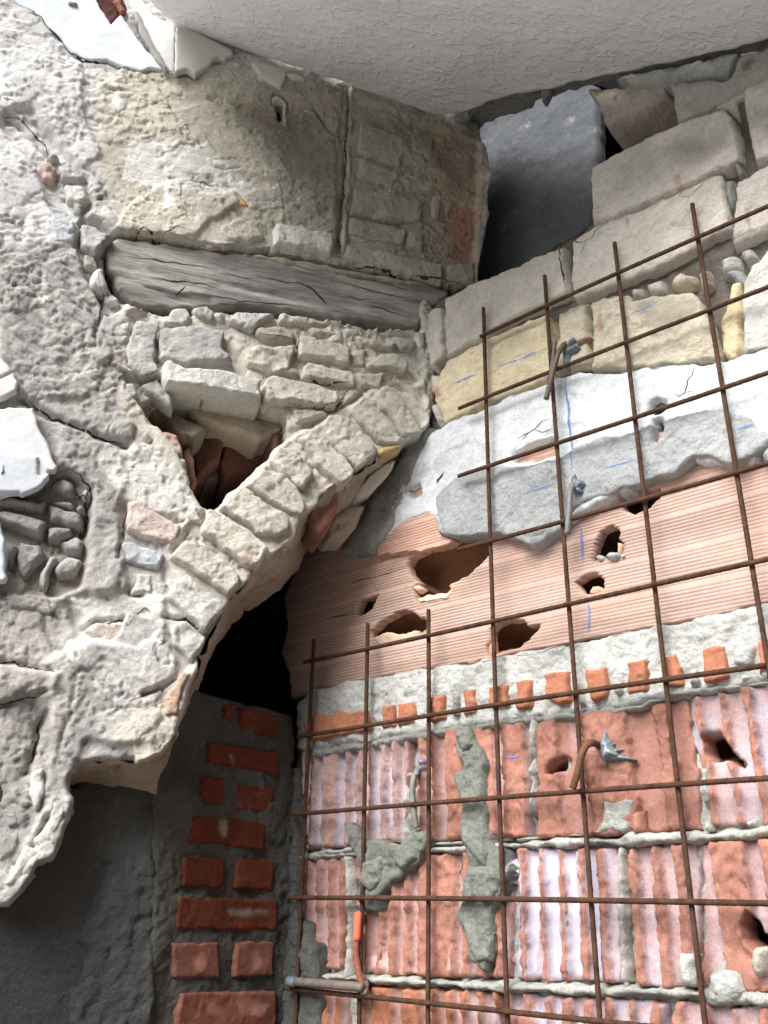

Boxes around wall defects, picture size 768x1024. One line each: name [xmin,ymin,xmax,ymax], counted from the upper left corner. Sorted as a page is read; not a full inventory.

peeling [0,0,233,79]
peeling [252,62,305,90]
crack [2,97,48,155]
peeling [101,206,119,227]
crack [29,400,128,445]
crack [515,419,552,440]
spalling [148,409,283,524]
peeling [114,613,166,656]
spalling [285,202,768,1024]